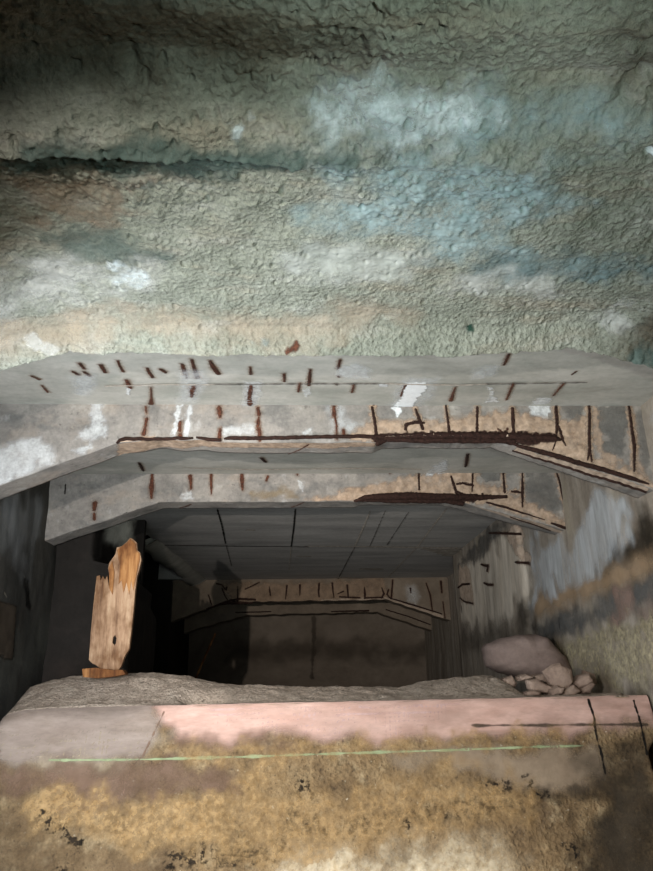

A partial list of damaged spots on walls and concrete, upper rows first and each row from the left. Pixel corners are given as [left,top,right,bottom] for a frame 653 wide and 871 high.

leakage [343,157,557,257]
leakage [173,405,192,437]
rust [181,359,199,398]
rust [247,367,261,441]
leakage [391,382,427,417]
rust [450,428,557,446]
rust [138,463,154,499]
spalling [116,405,653,565]
leakage [423,526,532,635]
leakage [0,592,653,871]
crack [587,699,606,774]
crack [633,700,648,755]